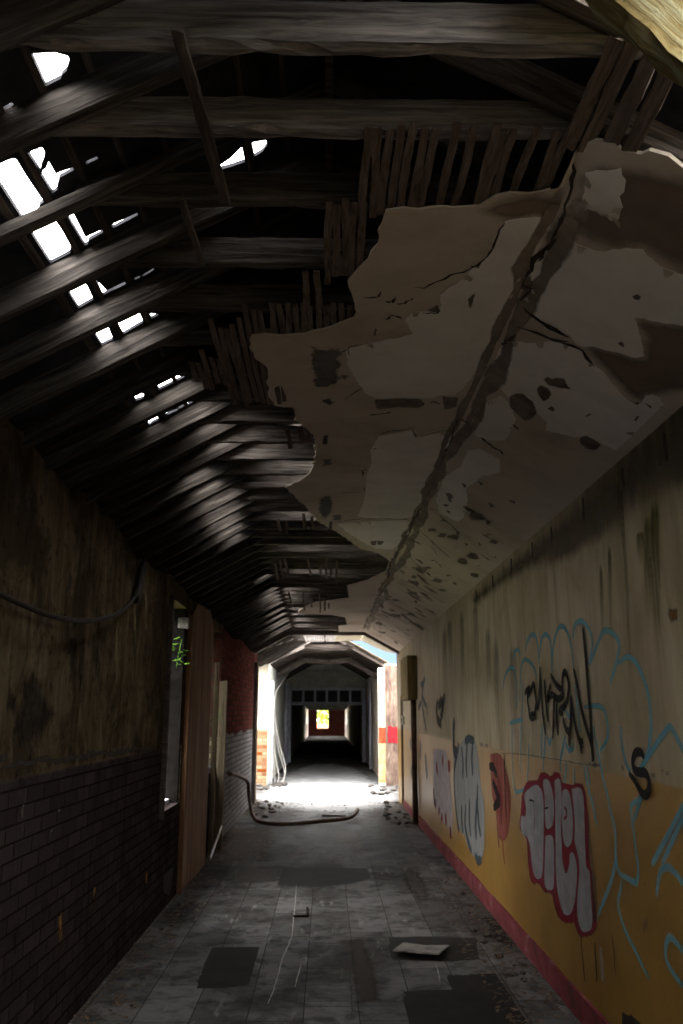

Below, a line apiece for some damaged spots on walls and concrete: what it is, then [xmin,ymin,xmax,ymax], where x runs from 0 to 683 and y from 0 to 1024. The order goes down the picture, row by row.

crack [342,223,505,356]
crack [501,162,594,366]
peeling [577,168,626,228]
crack [343,401,505,493]
peeling [336,217,683,577]
leakage [363,173,683,630]
crack [336,508,460,625]
spalling [373,559,456,644]